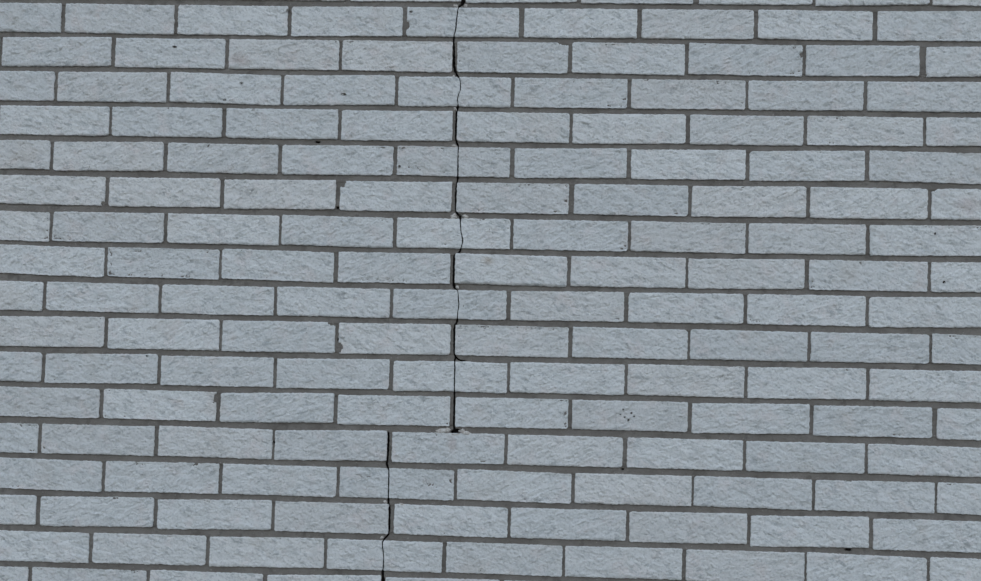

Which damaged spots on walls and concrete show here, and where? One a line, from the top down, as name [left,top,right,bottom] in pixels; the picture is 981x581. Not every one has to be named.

crack [450,0,468,433]
crack [380,432,404,581]